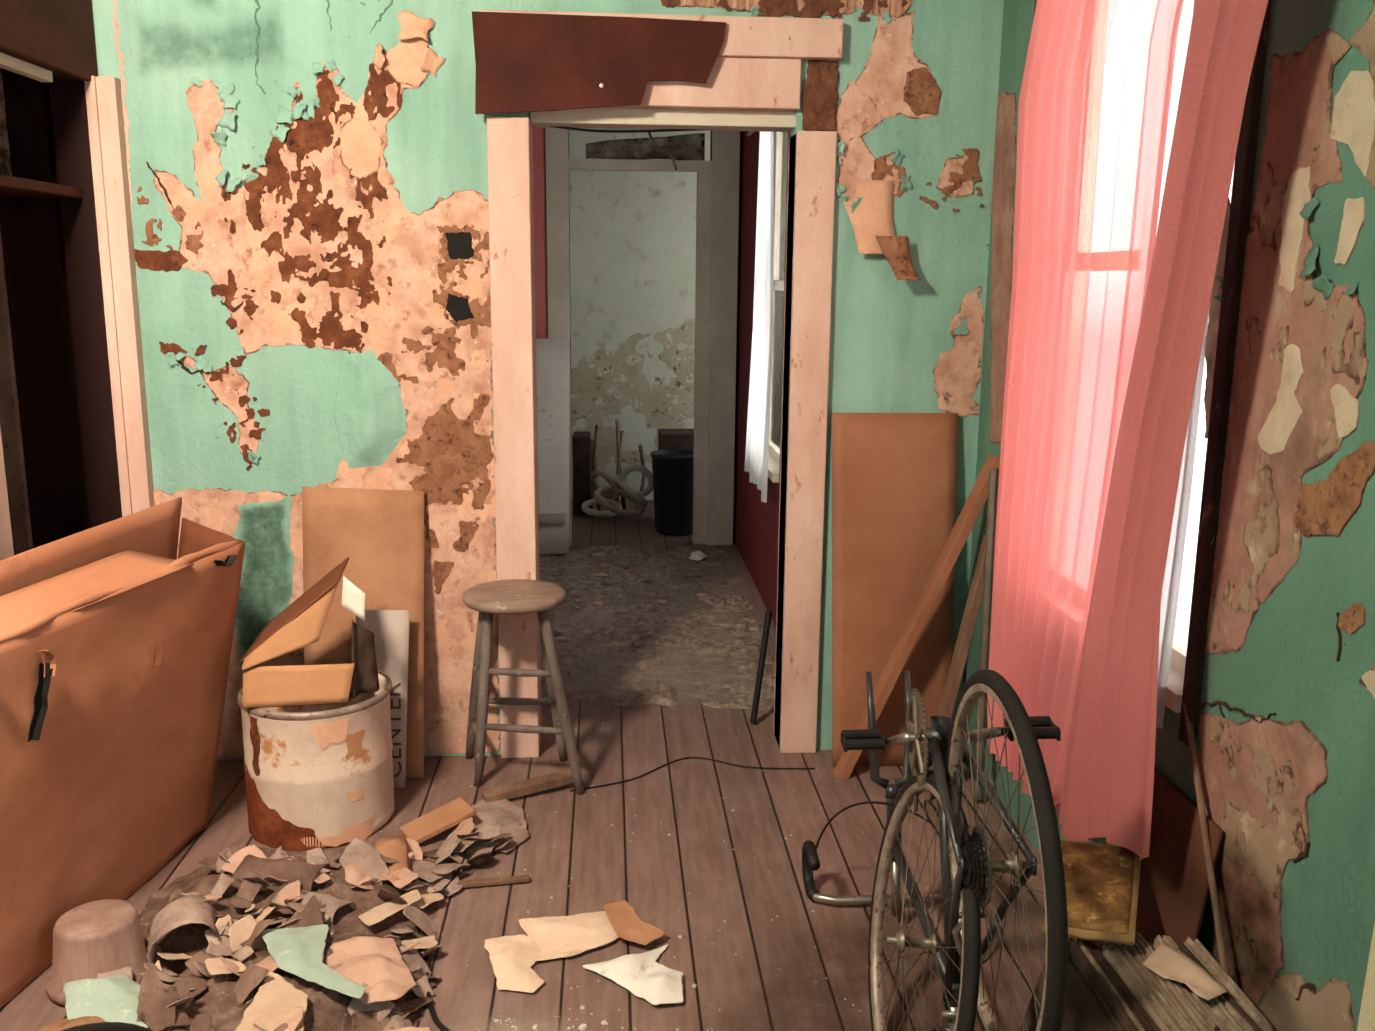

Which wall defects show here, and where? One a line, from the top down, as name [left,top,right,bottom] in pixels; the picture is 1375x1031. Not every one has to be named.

crack [254,0,266,95]
crack [370,0,393,34]
spalling [661,0,681,8]
flaking render [751,0,1017,444]
peeling [134,10,501,758]
peeling [571,318,695,471]
peeling [1204,0,1375,655]
flaking render [1358,662,1375,699]
peeling [1198,713,1355,1031]